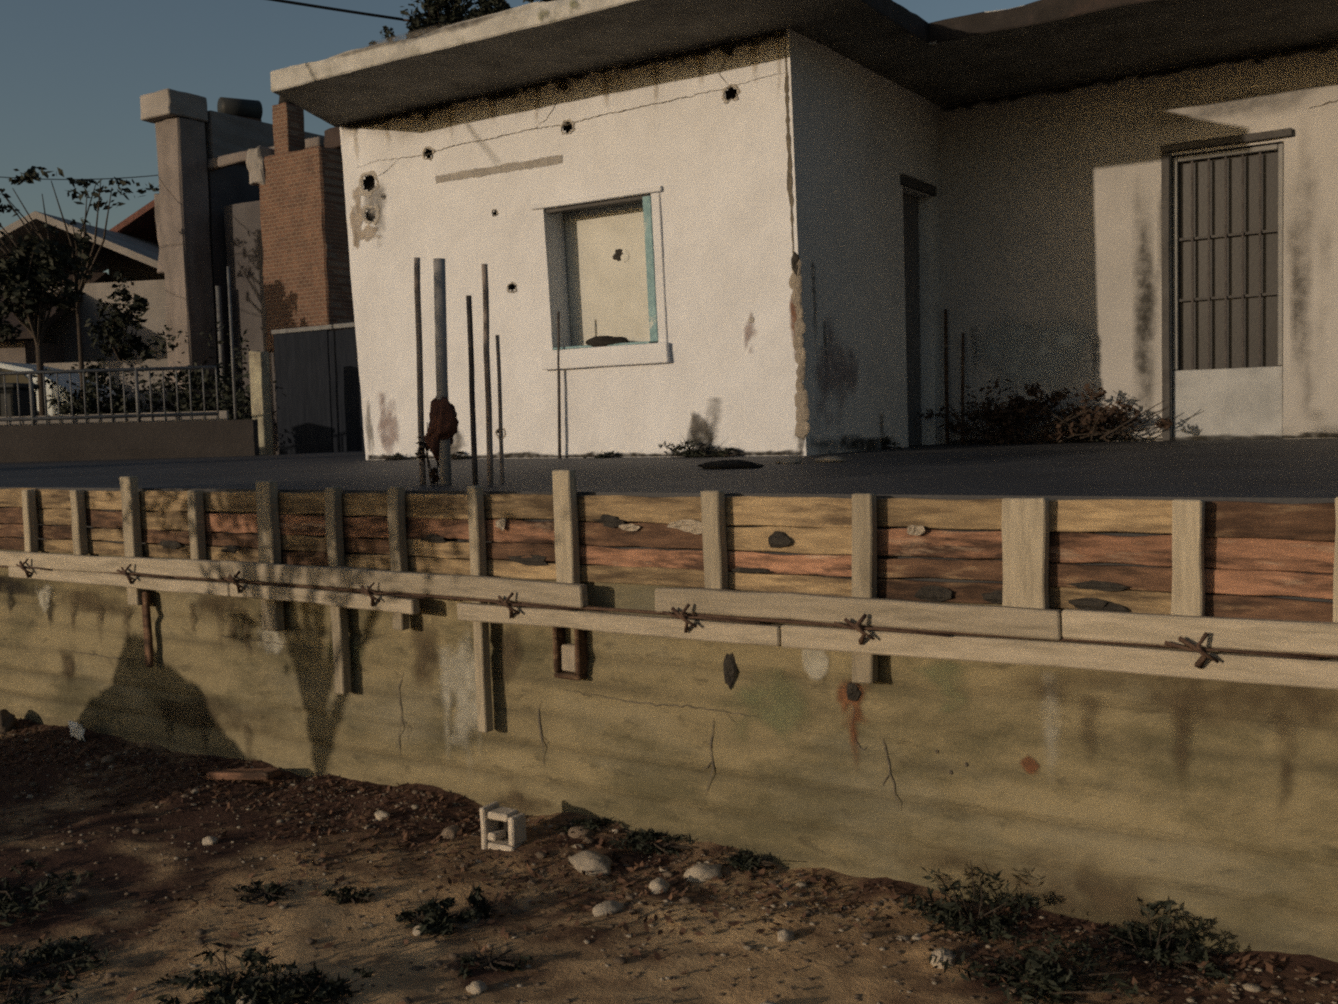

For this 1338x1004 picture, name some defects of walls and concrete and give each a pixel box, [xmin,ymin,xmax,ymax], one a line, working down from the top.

spalling [350,170,386,249]
water stain [1137,235,1153,374]
spalling [789,251,810,440]
water stain [367,398,435,459]
water stain [459,414,801,459]